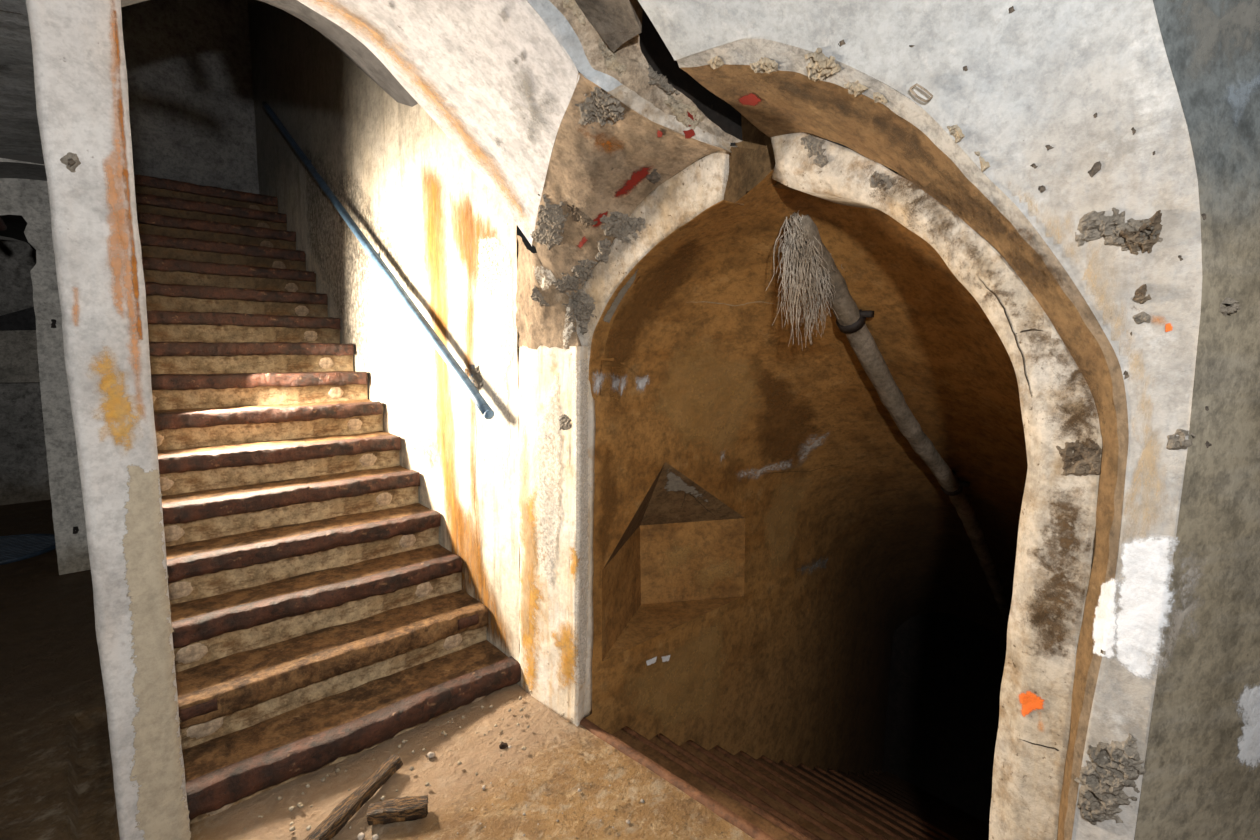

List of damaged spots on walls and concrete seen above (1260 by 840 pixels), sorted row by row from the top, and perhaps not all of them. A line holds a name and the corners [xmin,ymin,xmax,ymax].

spalling [575,86,625,129]
corrosion [106,0,143,369]
spalling [530,194,646,250]
spalling [1075,207,1163,255]
peeling [563,307,573,350]
corrosion [422,172,501,593]
spalling [1056,439,1102,477]
spalling [1166,429,1212,450]
corrosion [570,548,581,574]
corrosion [521,499,548,691]
corrosion [552,623,579,685]
spalling [1074,733,1146,825]